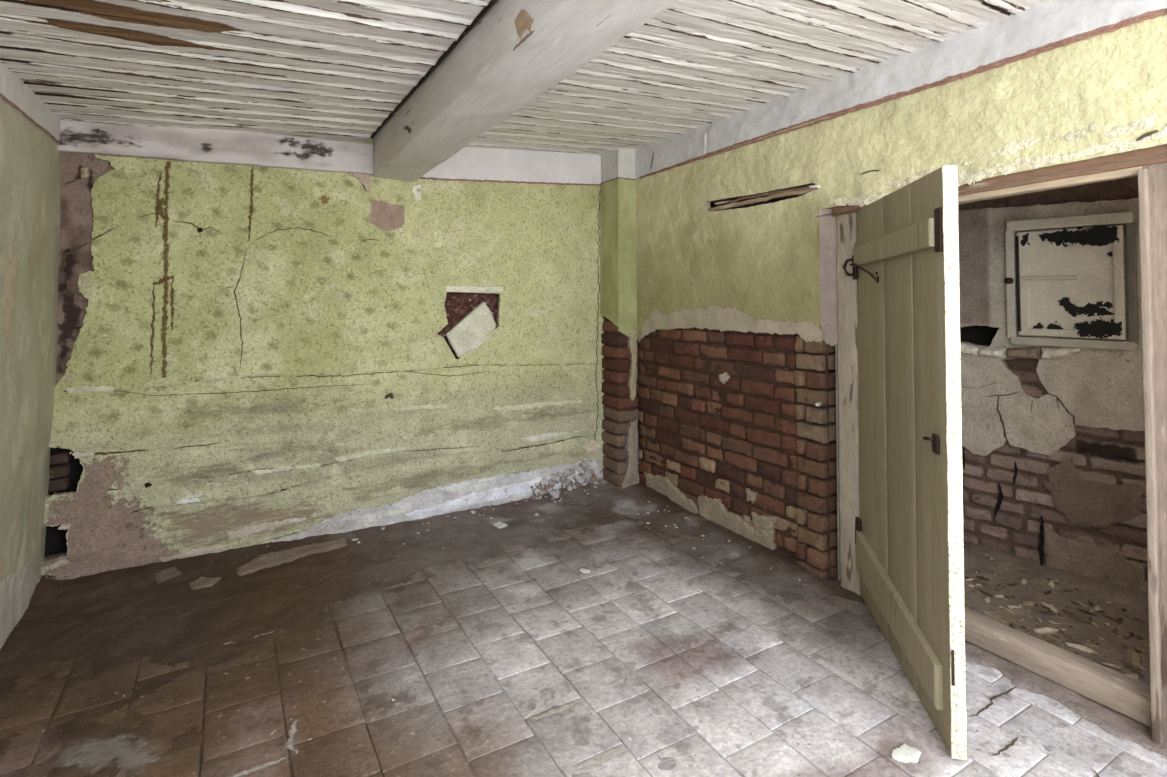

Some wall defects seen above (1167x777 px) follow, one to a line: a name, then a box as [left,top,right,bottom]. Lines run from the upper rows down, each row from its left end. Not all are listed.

peeling [24,0,245,51]
spalling [346,173,405,232]
peeling [1020,224,1120,258]
spalling [56,153,115,394]
spalling [438,286,503,359]
peeling [1033,297,1123,339]
spalling [48,447,96,495]
spalling [159,305,838,579]
crack [961,382,1075,448]
spalling [44,523,71,570]
peeling [0,563,40,650]